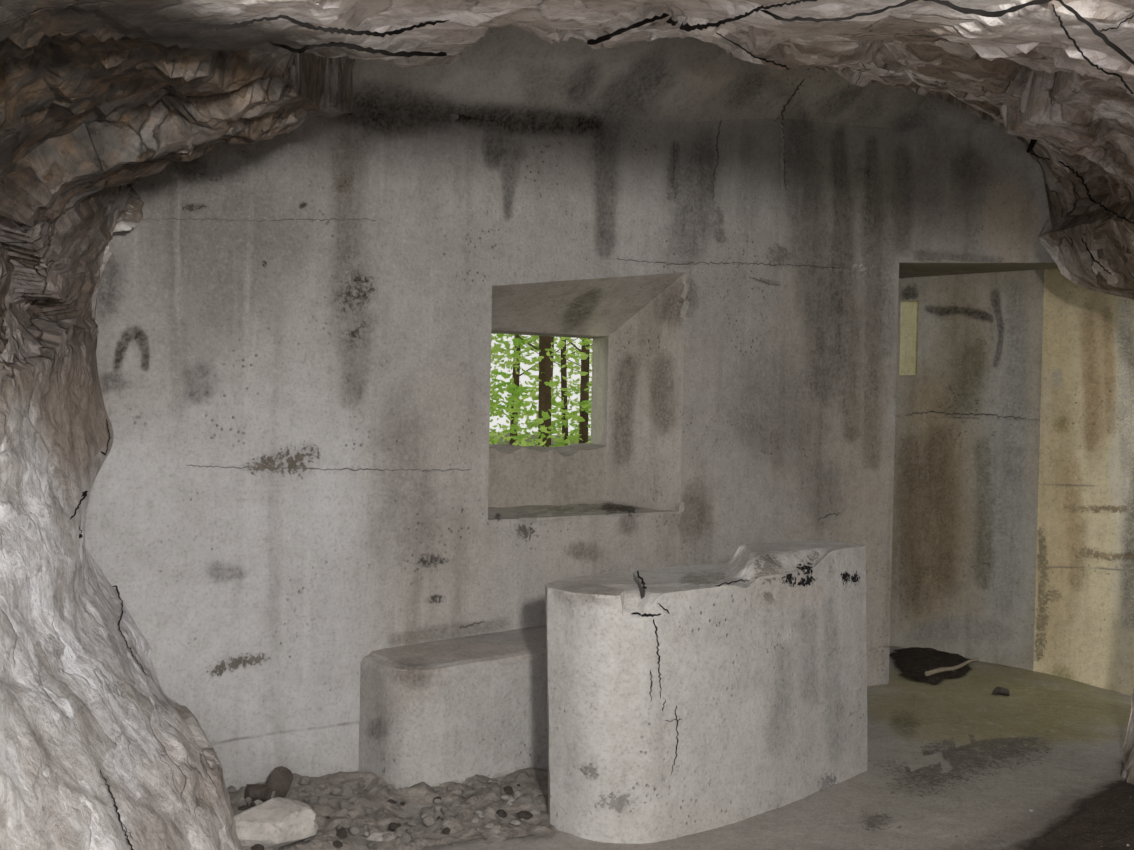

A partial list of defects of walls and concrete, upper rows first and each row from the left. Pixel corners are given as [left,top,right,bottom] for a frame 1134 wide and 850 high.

water stain [340,273,375,312]
spalling [754,553,782,604]
crack [631,570,680,775]